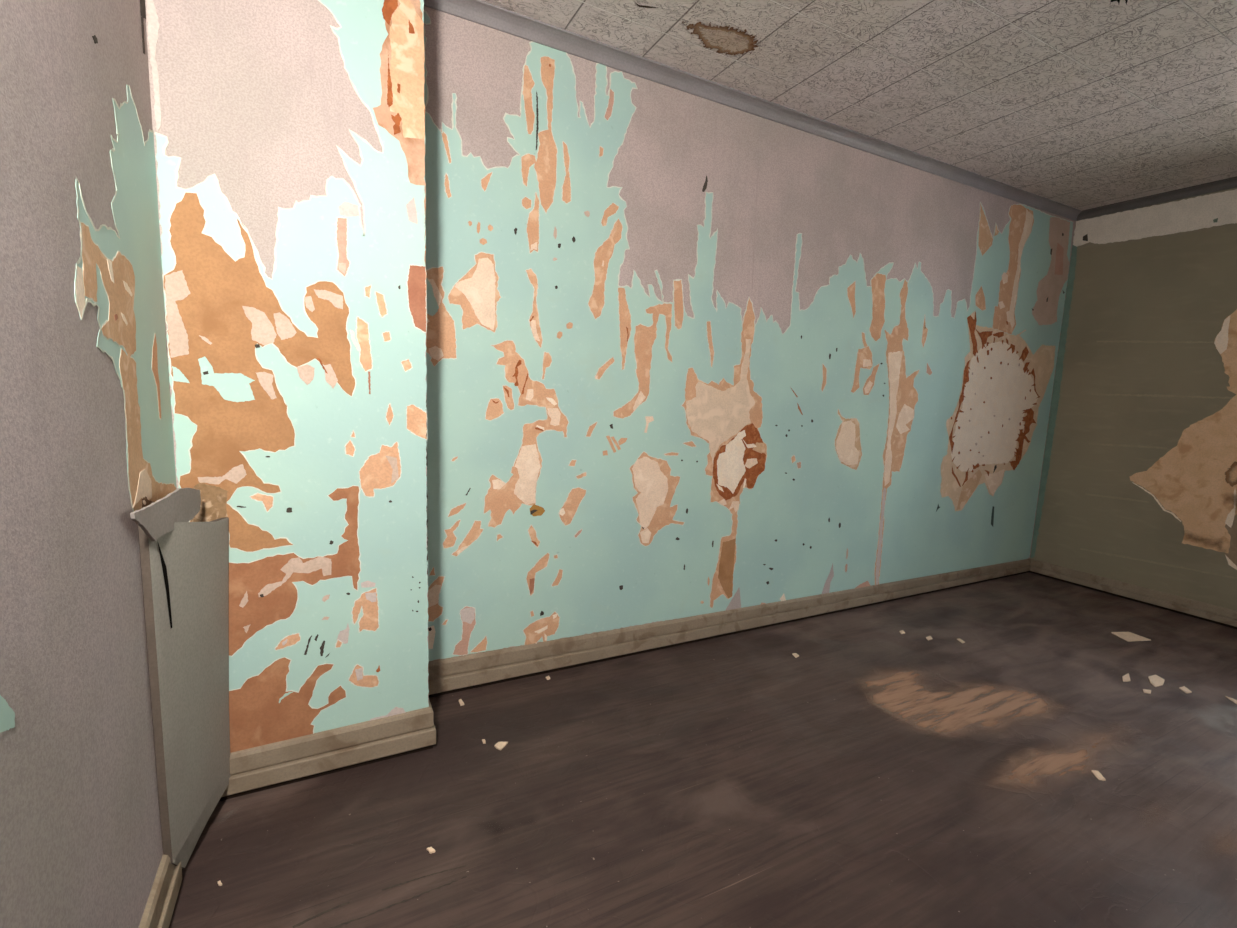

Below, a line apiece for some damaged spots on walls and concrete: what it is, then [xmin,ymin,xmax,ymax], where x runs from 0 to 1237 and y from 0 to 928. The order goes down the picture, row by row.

peeling [74,0,1237,753]
water stain [682,21,758,55]